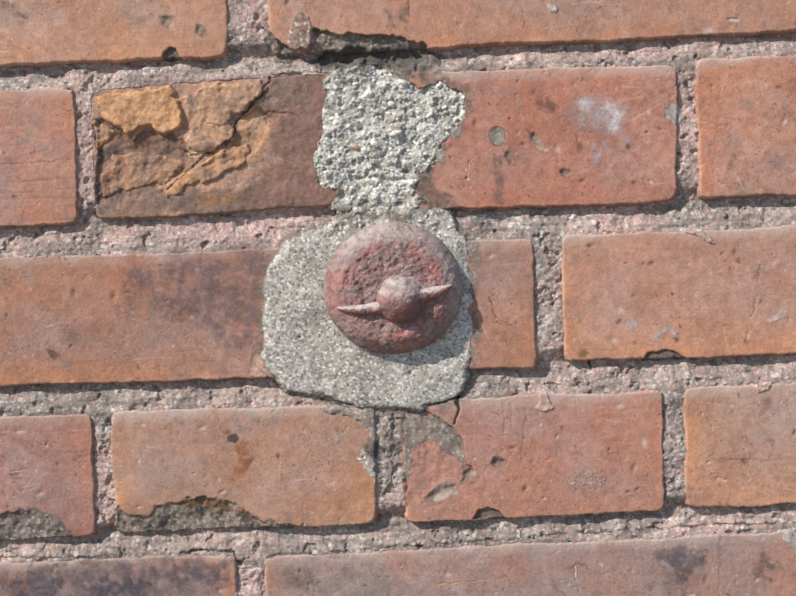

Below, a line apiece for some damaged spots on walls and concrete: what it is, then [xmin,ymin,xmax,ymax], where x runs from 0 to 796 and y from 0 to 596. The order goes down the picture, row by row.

spalling [160,16,174,29]
peeling [163,48,183,61]
spalling [264,11,429,64]
spalling [91,74,339,219]
crack [170,70,327,187]
peeling [357,455,378,478]
spalling [399,407,476,507]
spalling [0,509,75,541]
spalling [115,496,295,533]